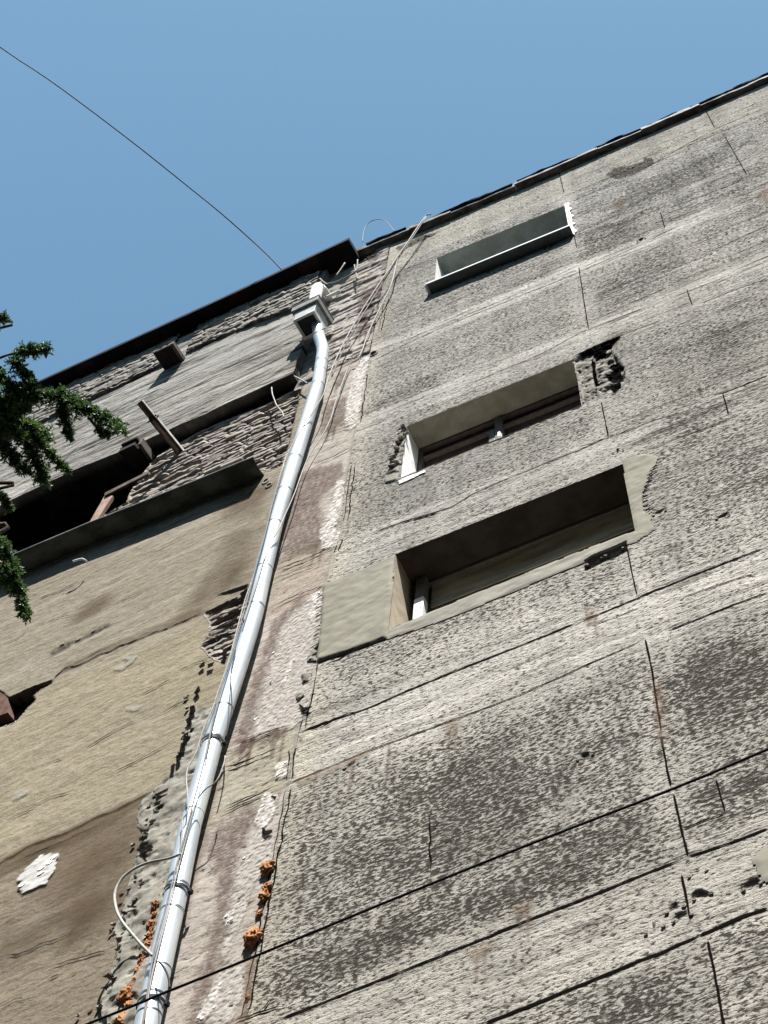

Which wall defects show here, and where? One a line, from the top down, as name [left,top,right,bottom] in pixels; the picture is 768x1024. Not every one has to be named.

spalling [573,335,627,402]
spalling [384,424,425,484]
leakage [281,463,342,558]
spalling [199,584,251,668]
peeling [244,586,323,742]
spalling [170,686,200,774]
spalling [130,788,168,858]
crack [428,815,437,867]
spalling [109,875,142,962]
peeling [197,792,277,1024]
spalling [644,868,714,934]
spalling [737,877,763,892]